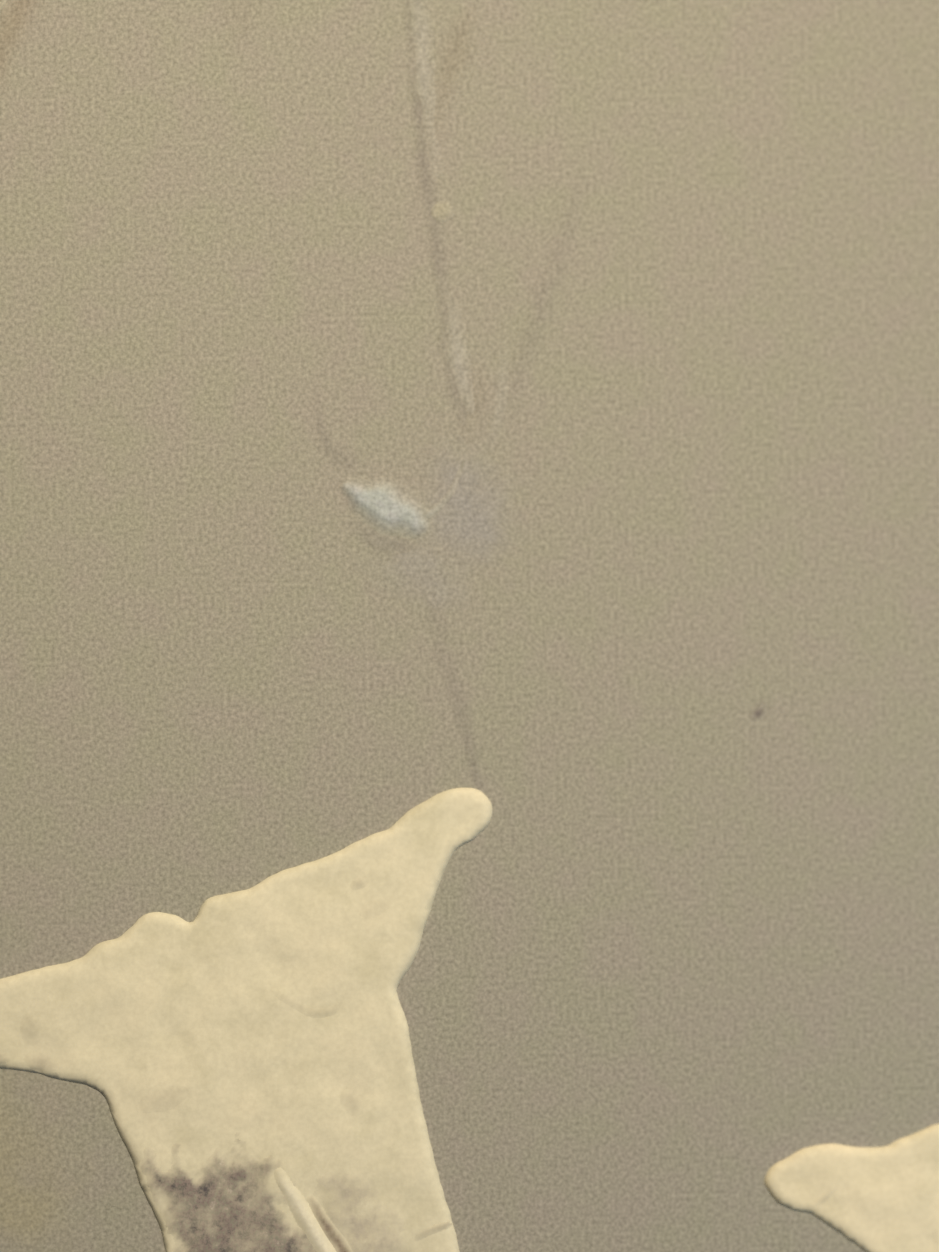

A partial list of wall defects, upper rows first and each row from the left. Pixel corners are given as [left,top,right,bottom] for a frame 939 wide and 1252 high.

crack [421,607,489,796]